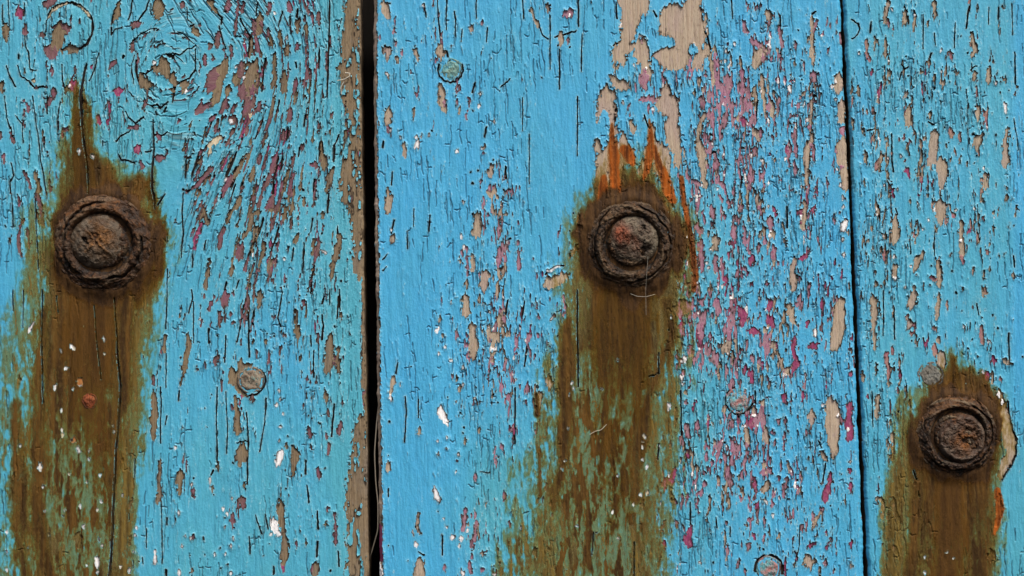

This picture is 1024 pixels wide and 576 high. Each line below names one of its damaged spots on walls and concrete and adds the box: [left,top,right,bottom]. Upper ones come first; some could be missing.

peeling [528,2,574,47]
corrosion [2,114,166,576]
crack [2,0,346,576]
peeling [0,0,482,576]
peeling [443,490,522,576]
peeling [434,143,581,473]
corrosion [498,120,698,576]
peeling [593,0,1019,576]
corrosion [883,356,1004,576]